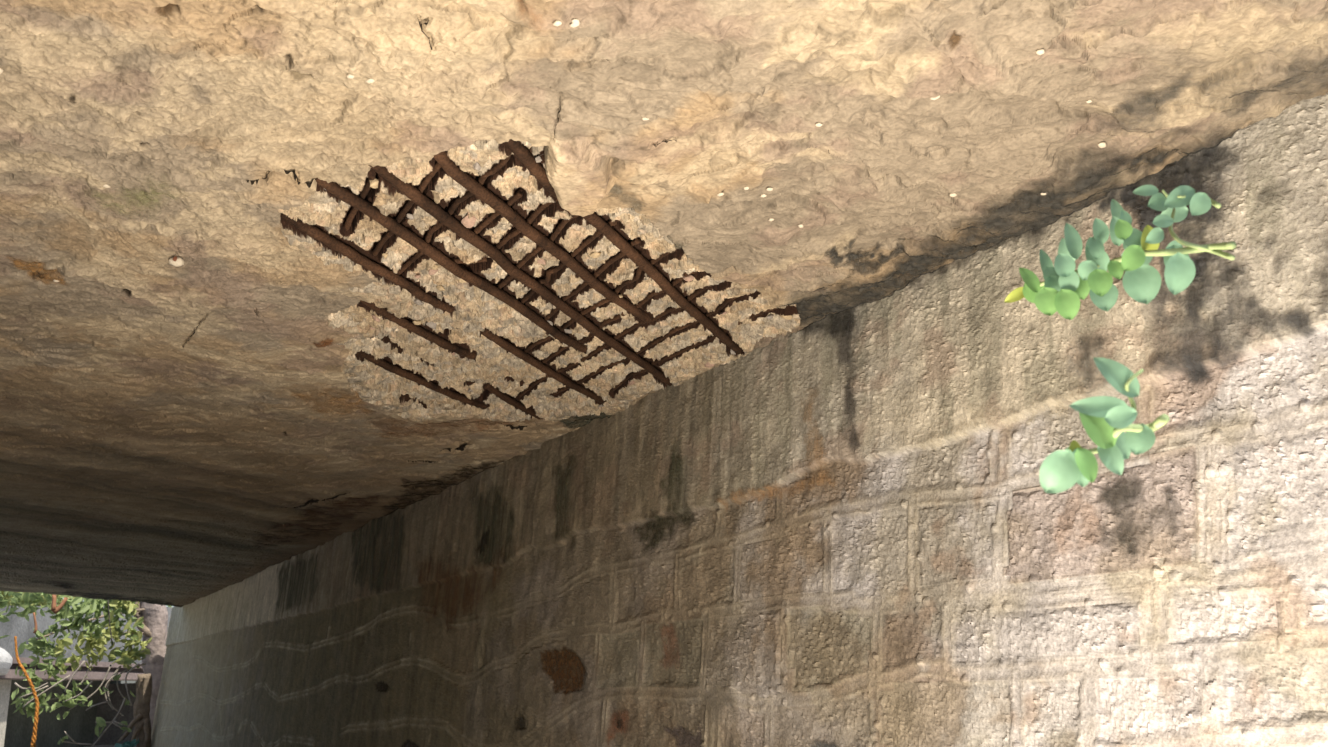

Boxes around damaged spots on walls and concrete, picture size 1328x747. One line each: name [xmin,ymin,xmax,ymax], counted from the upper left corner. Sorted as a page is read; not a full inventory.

spalling [278,139,800,422]
leakage [788,129,1314,448]
leakage [1100,481,1141,555]
corrosion [541,648,586,695]